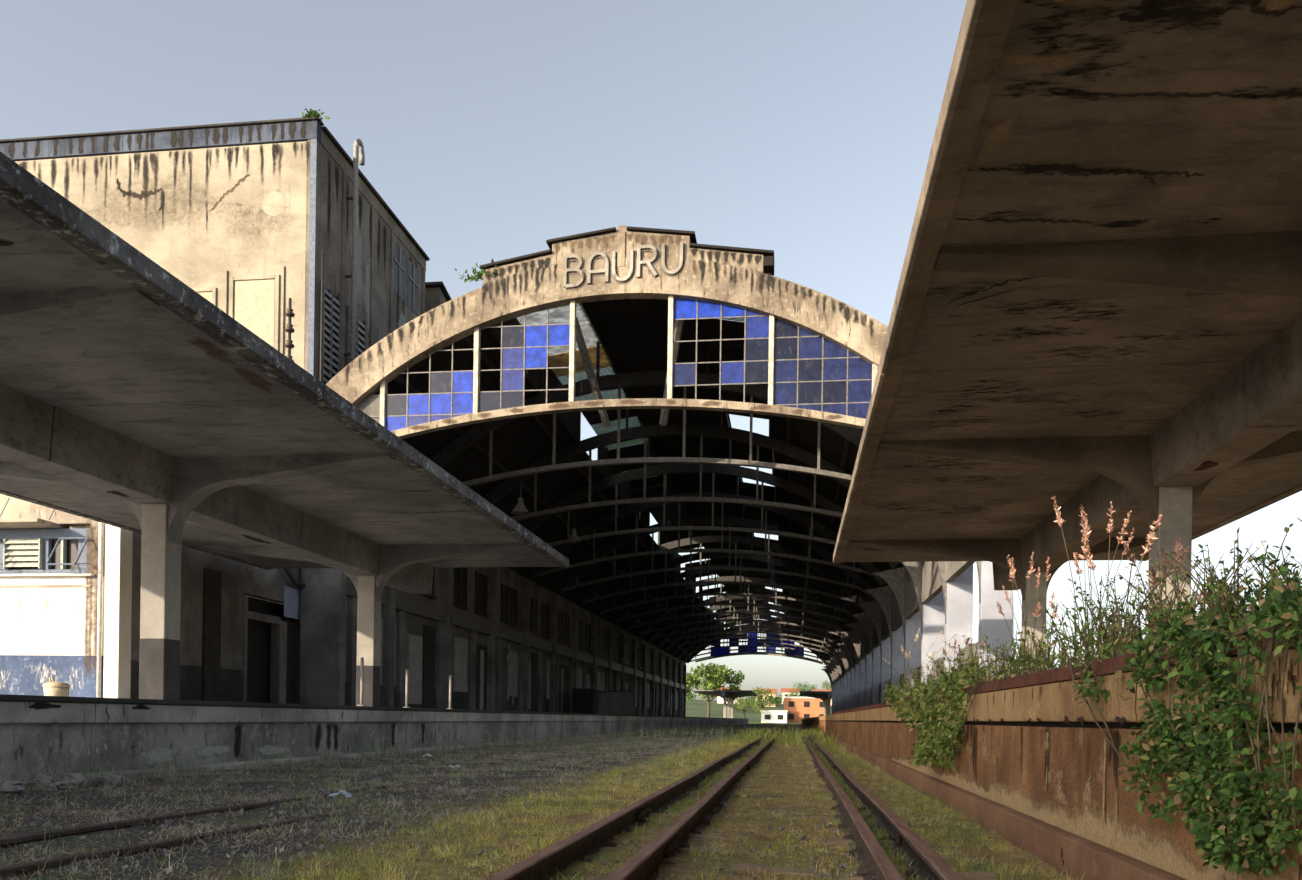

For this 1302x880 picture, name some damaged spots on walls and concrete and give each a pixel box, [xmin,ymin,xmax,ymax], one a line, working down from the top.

crack [1039,87,1302,103]
water stain [8,122,309,225]
crack [969,162,1205,186]
crack [116,178,165,211]
crack [209,174,251,212]
crack [955,211,1092,223]
crack [942,276,1038,306]
peeling [0,664,84,689]
water stain [892,740,1283,880]